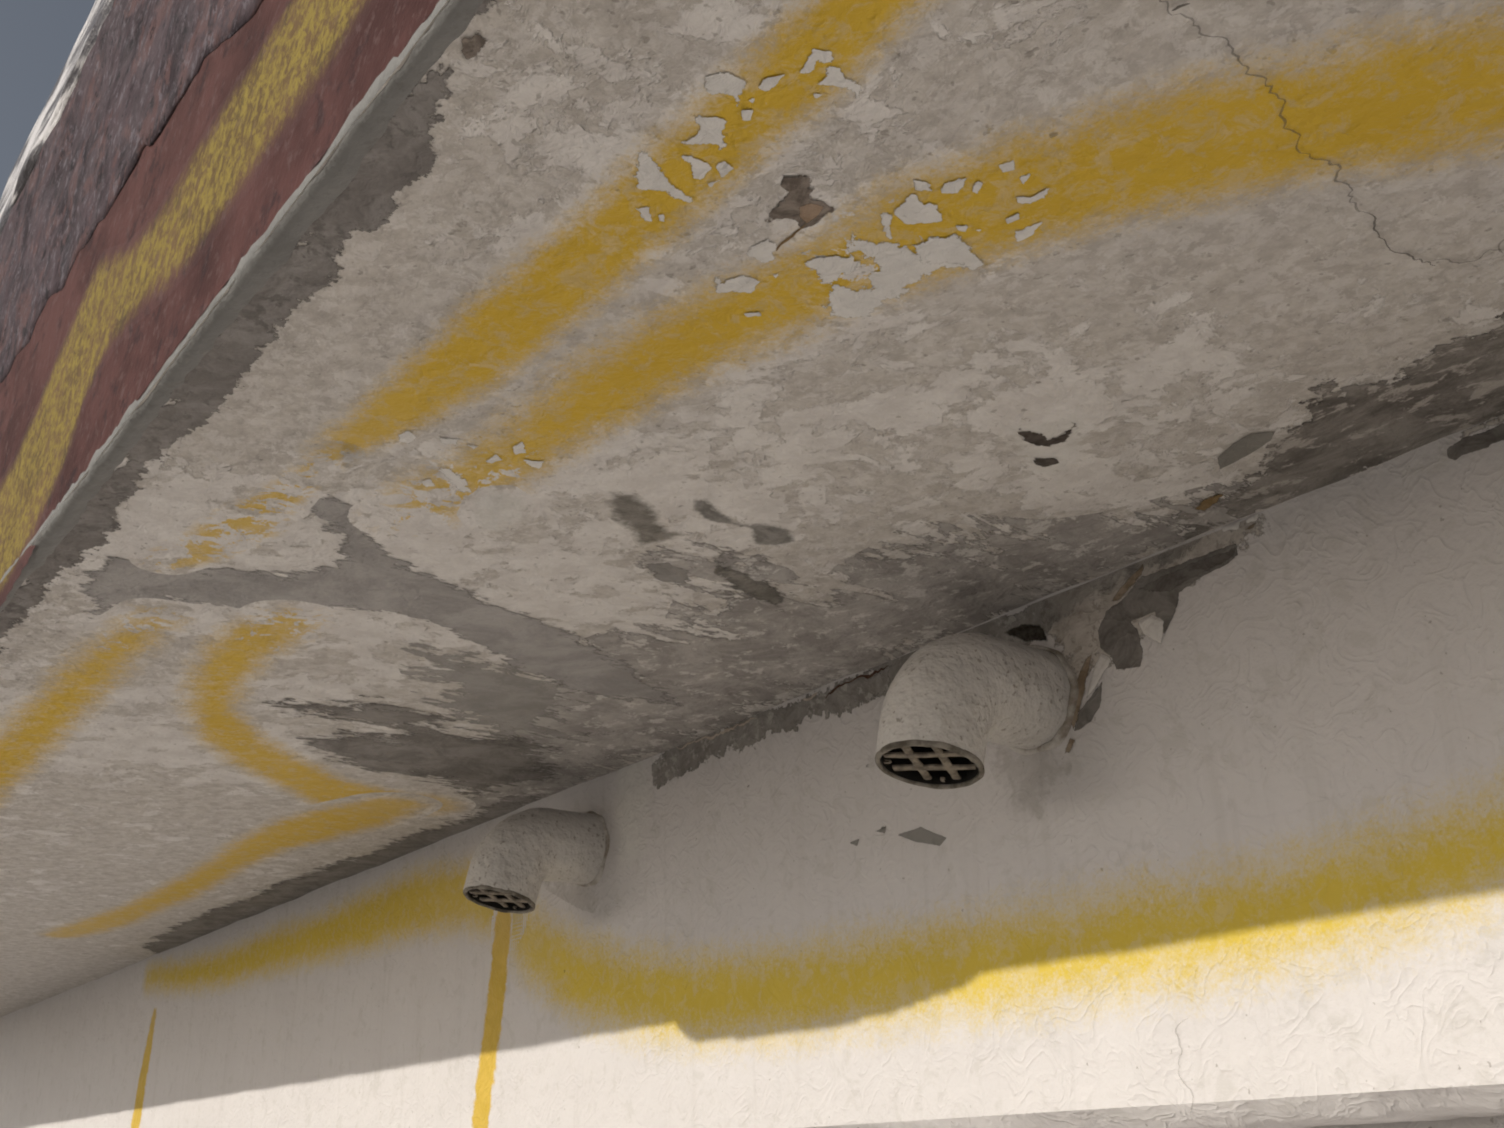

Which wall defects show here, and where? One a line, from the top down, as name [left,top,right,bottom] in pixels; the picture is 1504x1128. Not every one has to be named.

crack [1361,211,1435,266]
peeling [0,34,1504,824]
damp [603,490,689,584]
damp [688,496,797,546]
damp [714,566,784,605]